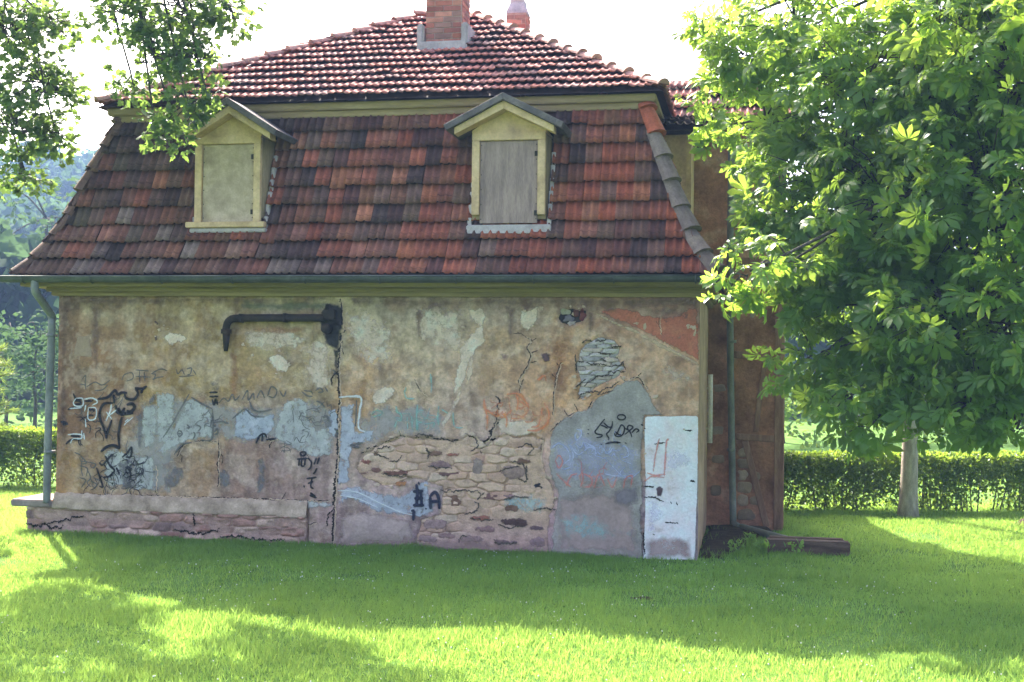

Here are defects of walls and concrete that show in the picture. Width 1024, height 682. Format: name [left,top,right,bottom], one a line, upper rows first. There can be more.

crack [141,299,408,544]
flaking render [357,417,557,553]
crack [480,332,593,460]
spalling [572,338,626,400]